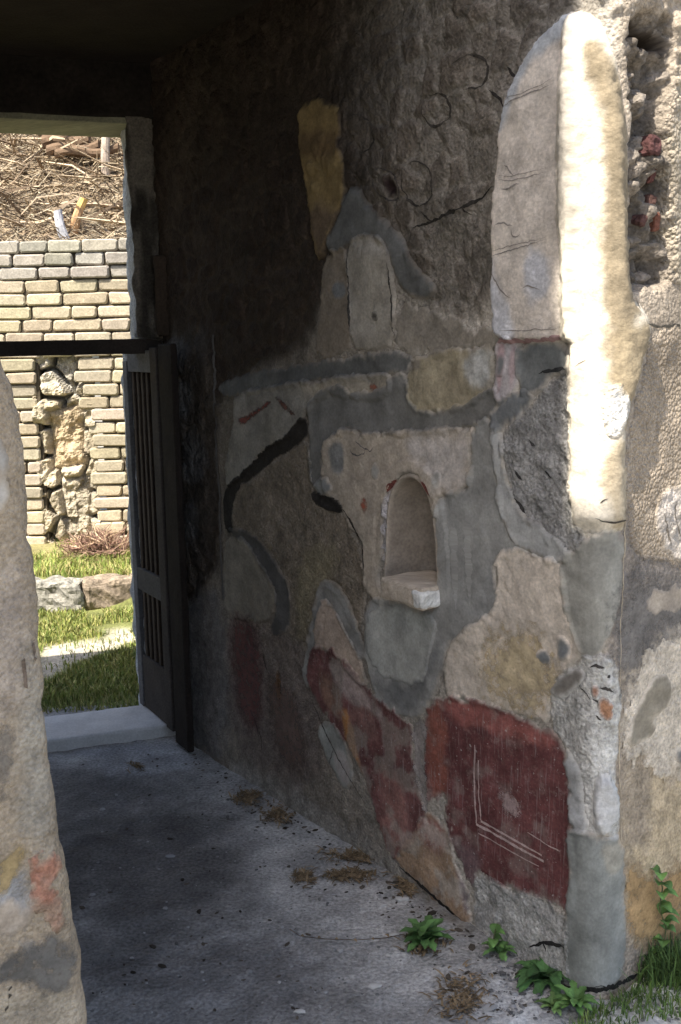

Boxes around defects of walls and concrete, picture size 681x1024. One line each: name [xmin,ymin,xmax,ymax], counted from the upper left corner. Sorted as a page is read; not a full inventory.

crack [421,54,515,129]
crack [401,161,493,228]
spalling [503,369,585,552]
spalling [536,635,681,837]
crack [530,941,565,951]
crack [562,971,641,993]